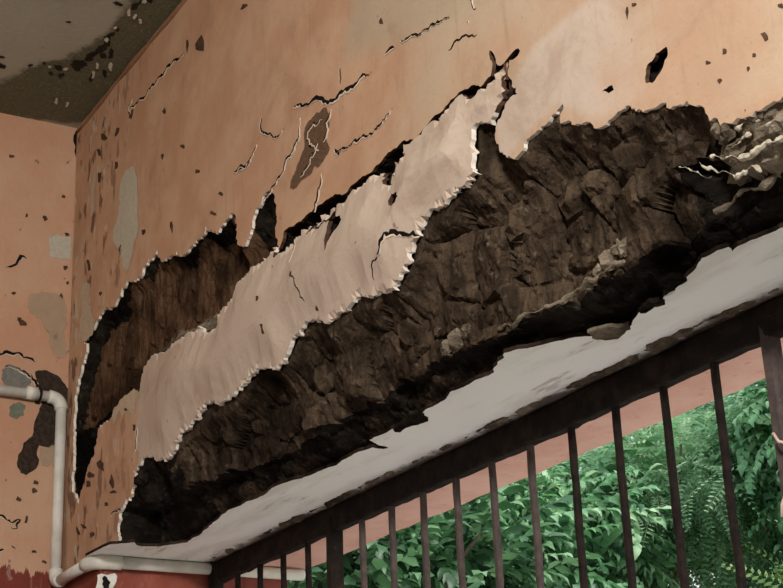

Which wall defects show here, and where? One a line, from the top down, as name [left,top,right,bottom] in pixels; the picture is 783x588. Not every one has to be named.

peeling [43,26,120,82]
crack [385,0,477,56]
crack [463,50,520,99]
flaking render [649,50,668,83]
crack [233,70,420,302]
peeling [113,162,146,271]
flaking render [120,78,783,544]
crack [0,350,37,387]
flaking render [1,365,68,402]
flaking render [66,193,287,506]
flaking render [17,401,56,493]
peeling [96,573,117,588]